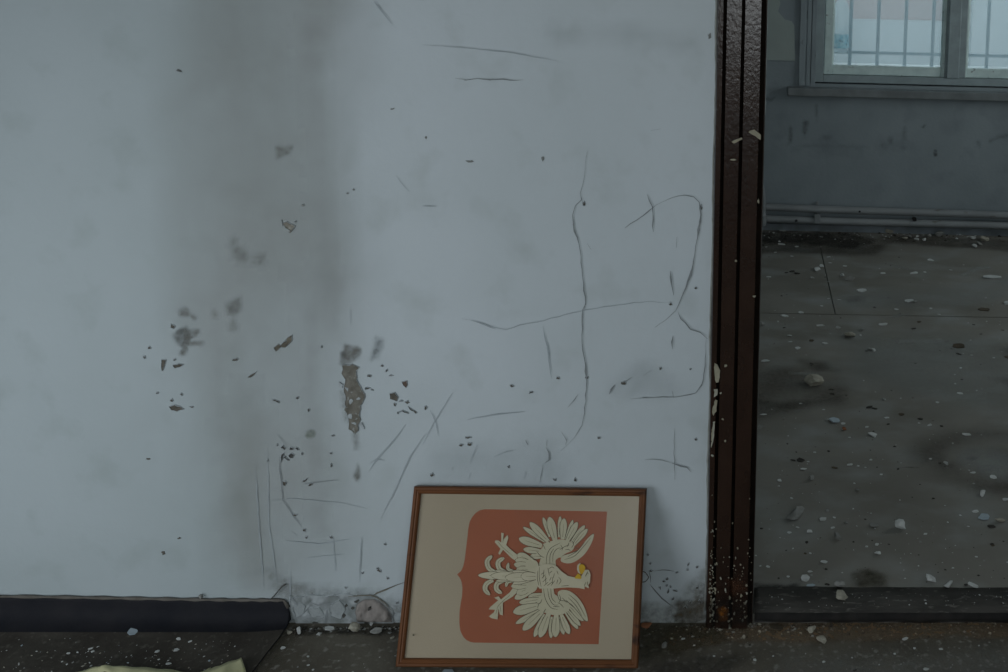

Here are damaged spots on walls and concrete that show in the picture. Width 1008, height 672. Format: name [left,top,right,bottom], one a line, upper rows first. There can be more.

crack [466,155,706,448]
peeling [338,346,374,434]
peeling [380,364,428,414]
crack [646,431,691,472]